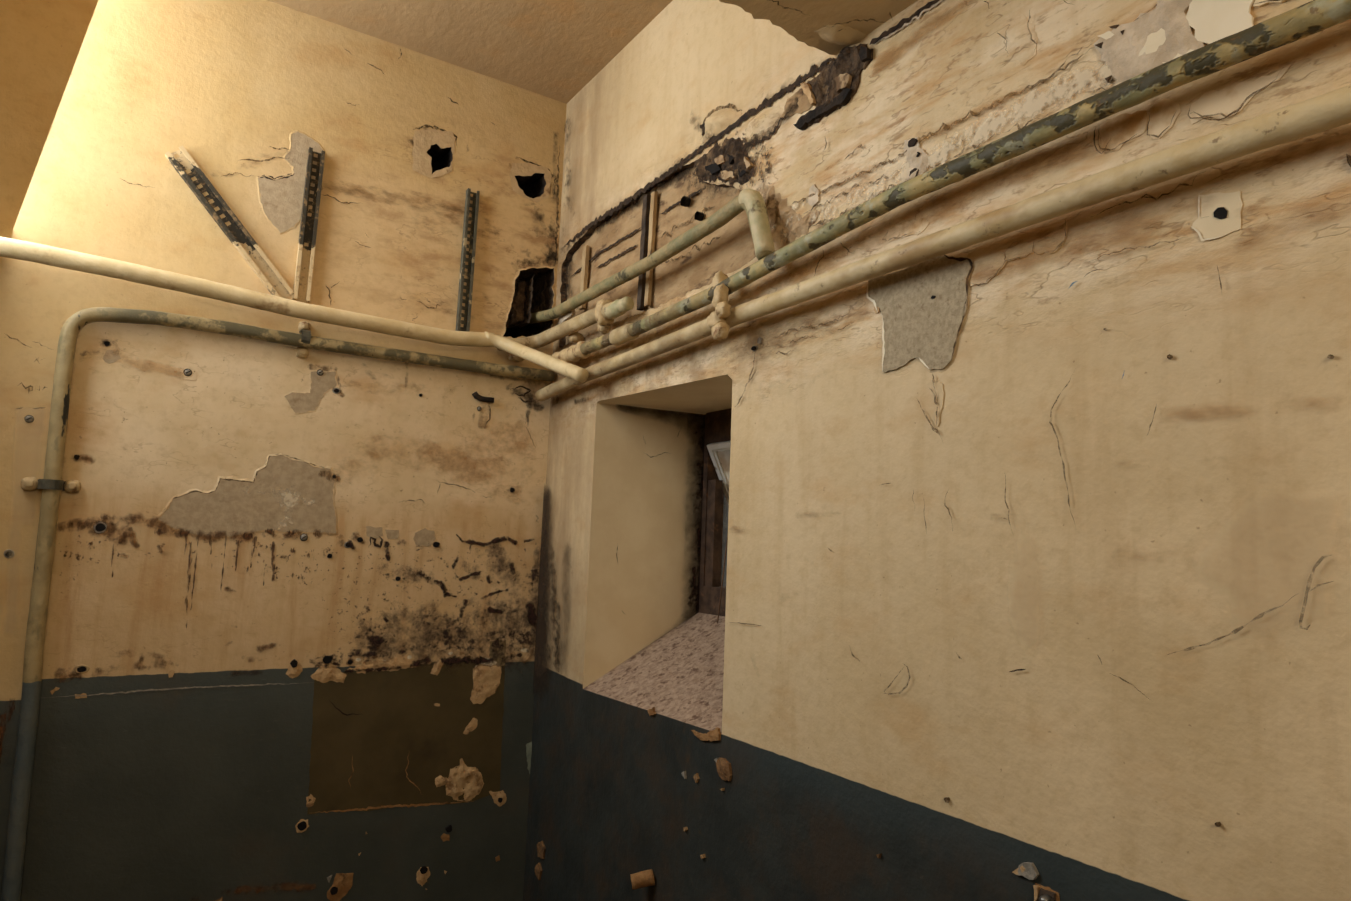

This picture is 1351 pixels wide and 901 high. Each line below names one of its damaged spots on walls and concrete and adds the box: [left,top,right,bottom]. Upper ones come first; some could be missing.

peeling [1093,0,1205,84]
peeling [238,130,327,235]
spalling [410,124,457,178]
water stain [847,162,910,201]
water stain [927,65,1112,167]
spalling [501,131,826,348]
peeling [866,218,1068,427]
peeling [157,453,338,540]
crack [1049,378,1075,523]
water stain [311,491,560,688]
crack [1167,556,1333,655]
peeling [286,640,533,734]